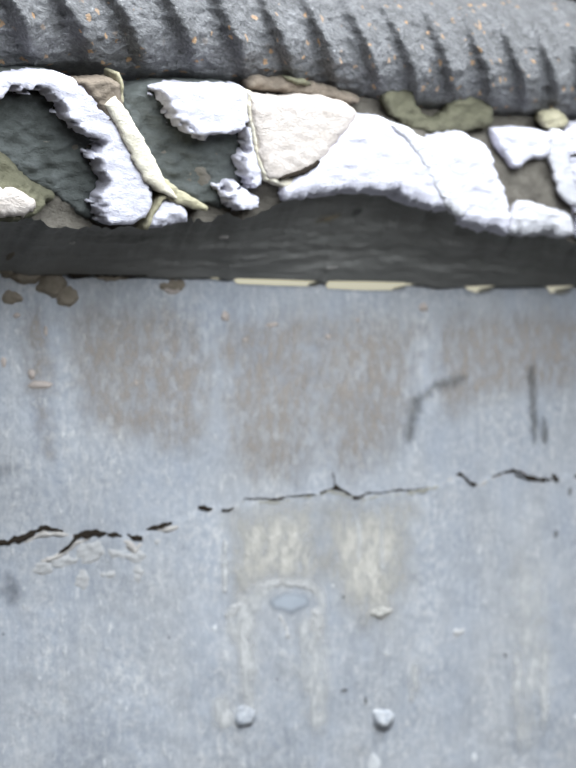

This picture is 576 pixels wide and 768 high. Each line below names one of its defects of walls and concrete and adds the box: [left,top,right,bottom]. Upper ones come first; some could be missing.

crack [198,469,576,512]
crack [0,522,179,563]
damp [222,509,317,592]
damp [331,508,403,608]